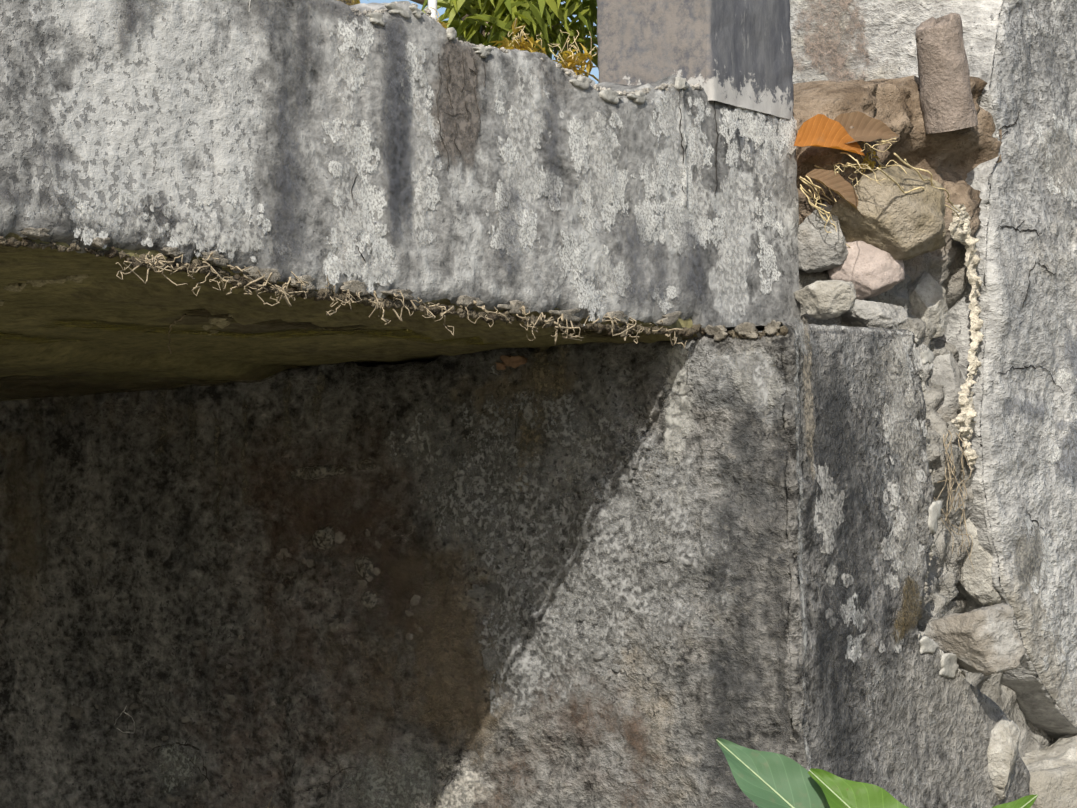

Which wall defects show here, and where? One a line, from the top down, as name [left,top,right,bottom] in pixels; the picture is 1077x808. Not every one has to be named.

water stain [383,18,410,238]
peeling [0,1,798,341]
crack [998,220,1056,308]
crack [997,365,1064,392]